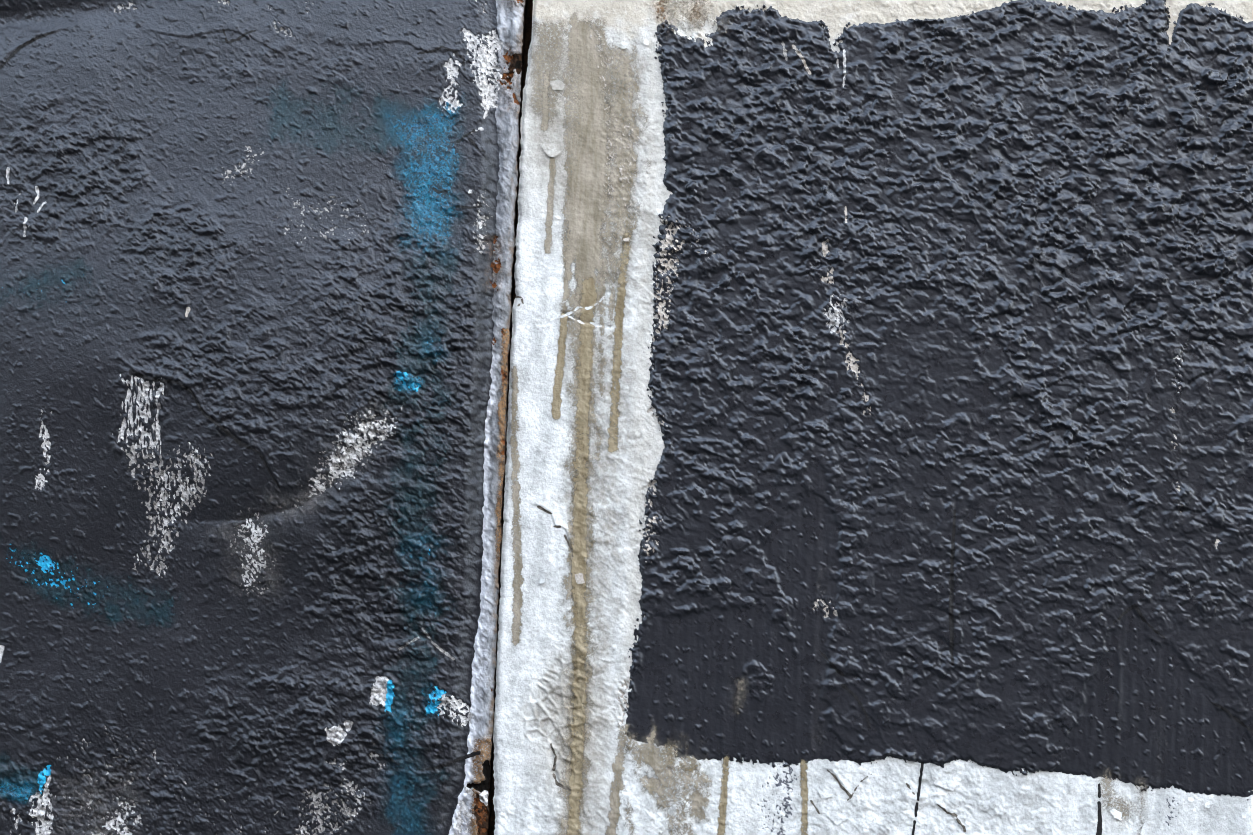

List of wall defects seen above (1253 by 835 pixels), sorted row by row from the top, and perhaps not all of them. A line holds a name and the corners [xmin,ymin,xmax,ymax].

peeling [408,28,505,235]
corrosion [497,52,520,105]
peeling [468,189,493,254]
peeling [112,374,213,578]
corrosion [491,328,510,562]
leakage [510,366,524,646]
leakage [531,12,650,835]
corrosion [468,738,492,835]
leakage [605,723,730,835]
leakage [800,760,808,835]
crack [906,762,966,835]
crack [1095,783,1103,835]